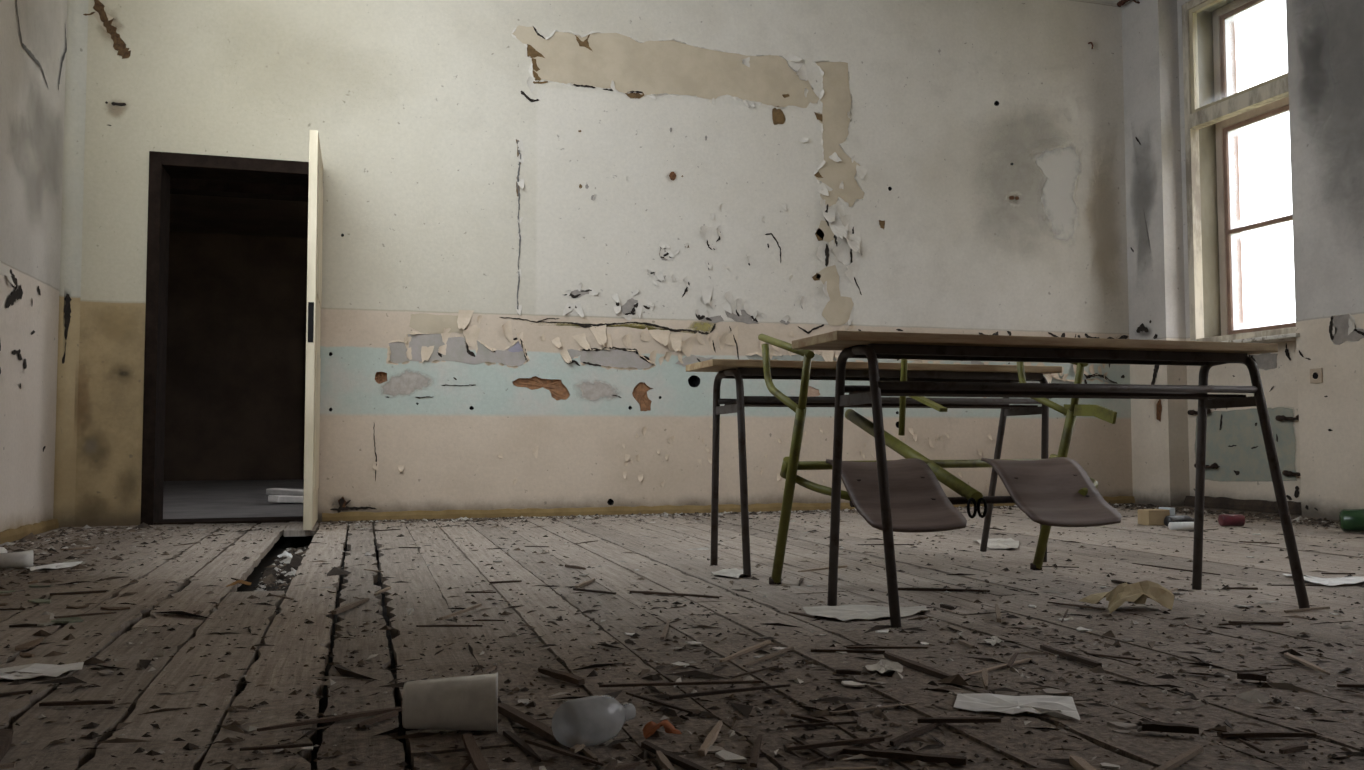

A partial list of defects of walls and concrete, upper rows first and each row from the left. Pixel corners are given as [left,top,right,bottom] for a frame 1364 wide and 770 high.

peeling [1036,148,1080,239]
peeling [375,25,867,411]
peeling [0,261,41,308]
peeling [1329,313,1364,345]
peeling [897,359,1118,384]
peeling [1249,343,1291,371]
peeling [1194,407,1299,500]